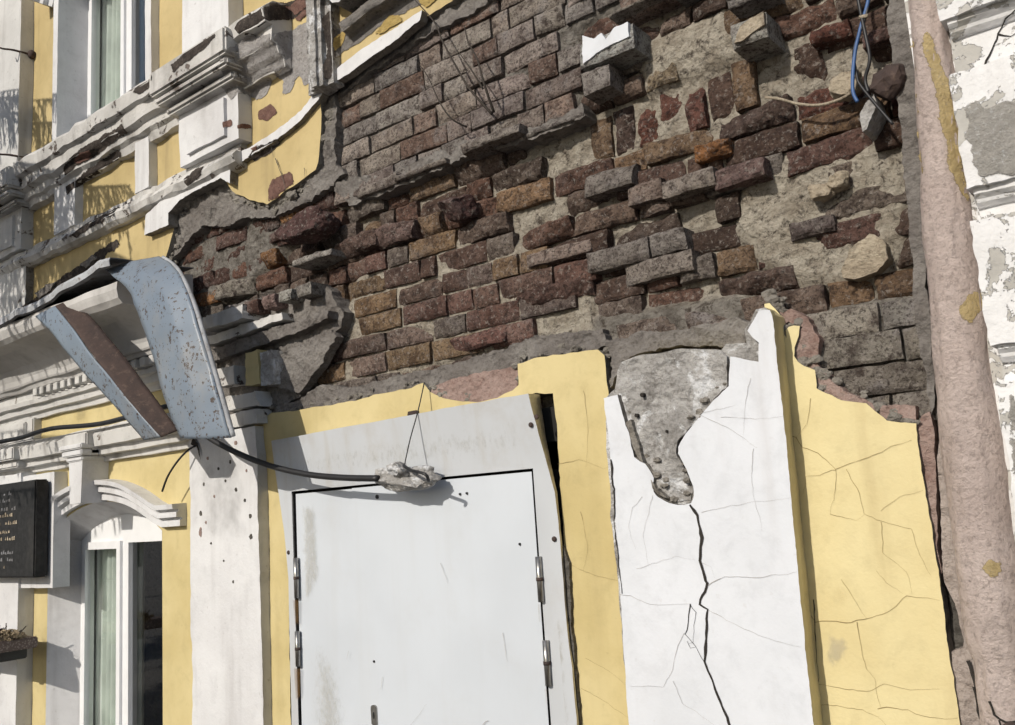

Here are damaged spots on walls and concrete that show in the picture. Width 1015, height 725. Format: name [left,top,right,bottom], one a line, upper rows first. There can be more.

peeling [922,32,1015,201]
peeling [22,240,120,307]
flaking render [169,0,981,725]
crack [559,378,1015,725]
peeling [982,560,1002,578]